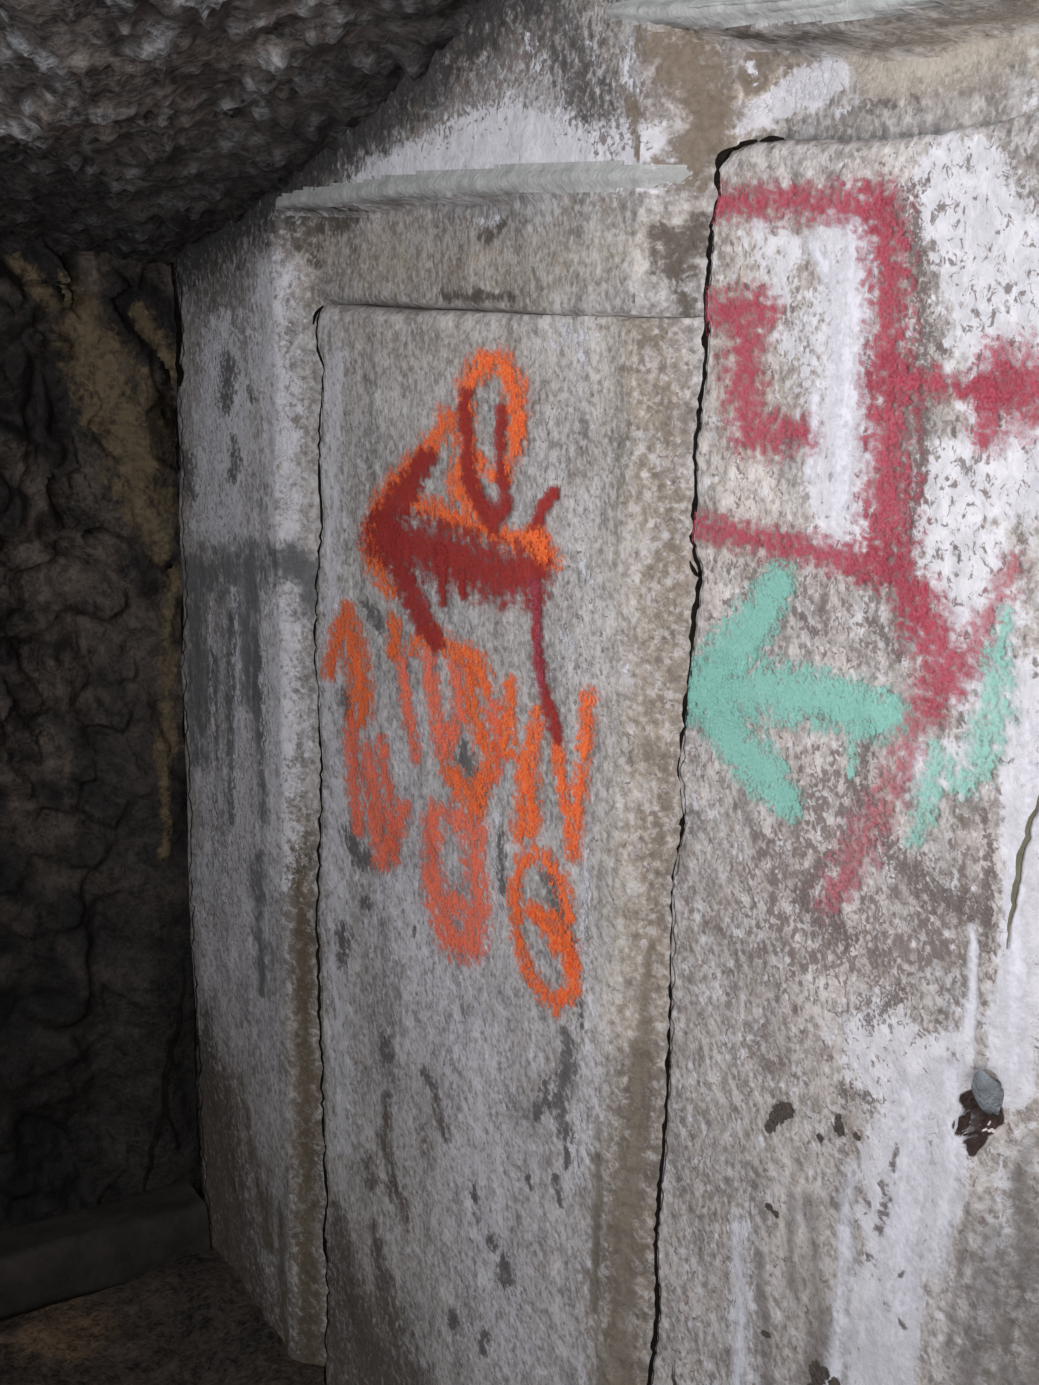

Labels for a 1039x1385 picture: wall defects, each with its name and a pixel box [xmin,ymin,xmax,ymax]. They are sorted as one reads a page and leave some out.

crack [312,305,329,1385]
crack [647,136,784,1385]
water stain [962,924,979,1044]
water stain [1002,712,1038,1083]
water stain [731,1220,766,1385]
water stain [806,1161,855,1385]
water stain [876,1062,964,1385]